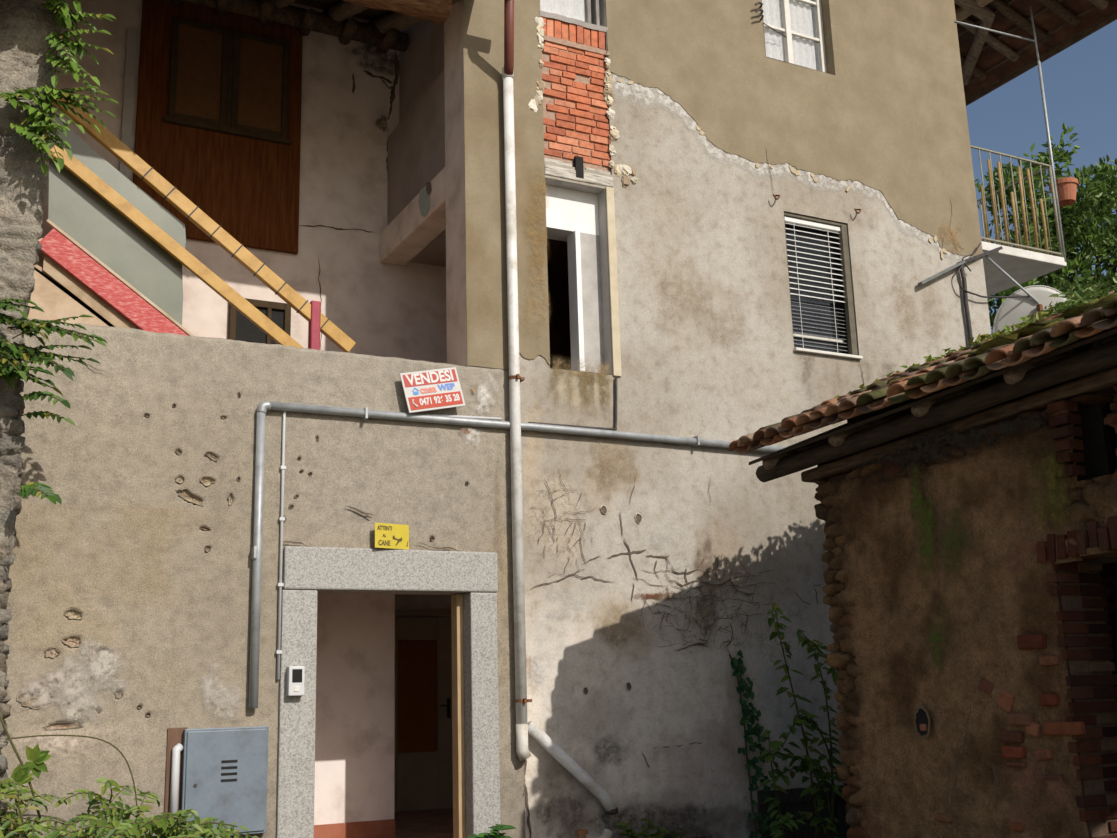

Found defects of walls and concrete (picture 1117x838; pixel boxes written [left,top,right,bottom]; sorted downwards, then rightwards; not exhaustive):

crack [352,50,399,181]
flaking render [528,10,980,261]
crack [299,224,371,232]
flaking render [175,475,217,507]
flaking render [64,609,83,620]
crack [531,471,821,654]
flaking render [16,636,124,751]